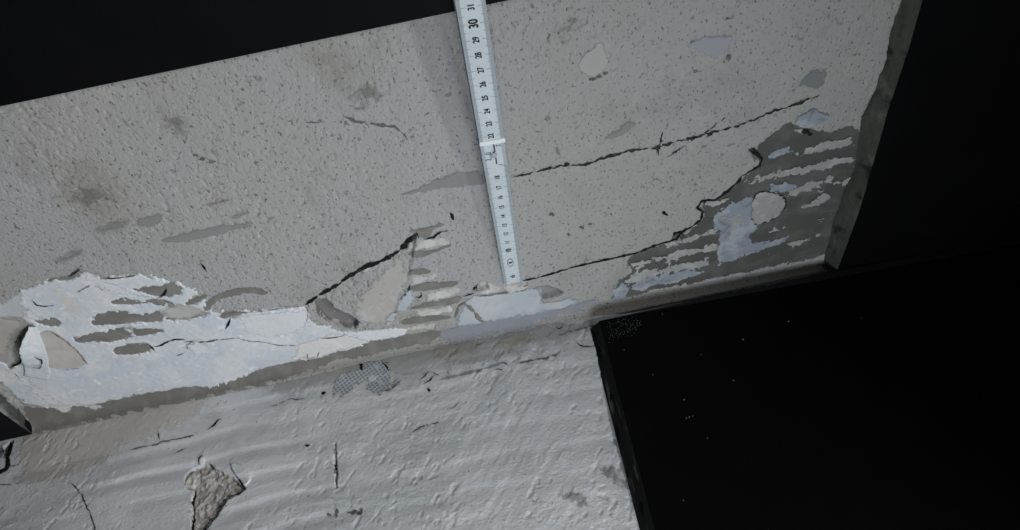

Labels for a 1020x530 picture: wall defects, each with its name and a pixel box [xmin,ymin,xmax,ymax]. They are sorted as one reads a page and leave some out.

crack [514,95,819,281]
flaking render [612,109,859,301]
peeling [0,213,577,434]
crack [0,441,20,485]
crack [71,483,96,530]
spalling [184,455,251,530]